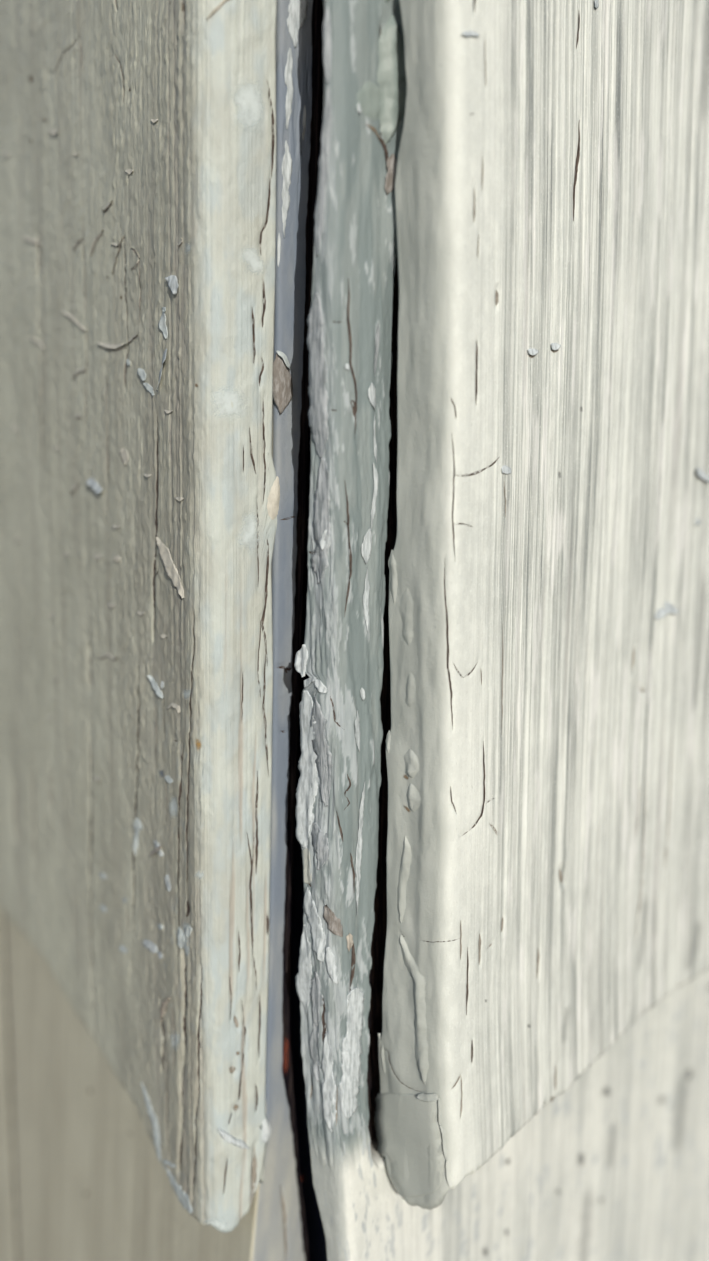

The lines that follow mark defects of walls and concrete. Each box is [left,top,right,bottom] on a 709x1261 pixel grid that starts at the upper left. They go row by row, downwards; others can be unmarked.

peeling [165,275,179,295]
peeling [98,334,154,395]
crack [329,279,357,432]
peeling [156,537,184,600]
crack [344,480,352,612]
crack [444,341,506,835]
peeling [147,675,180,713]
crack [134,81,296,1261]
peeling [294,644,366,1133]
crack [337,774,355,889]
crack [322,943,355,1042]
peeling [375,1093,453,1197]